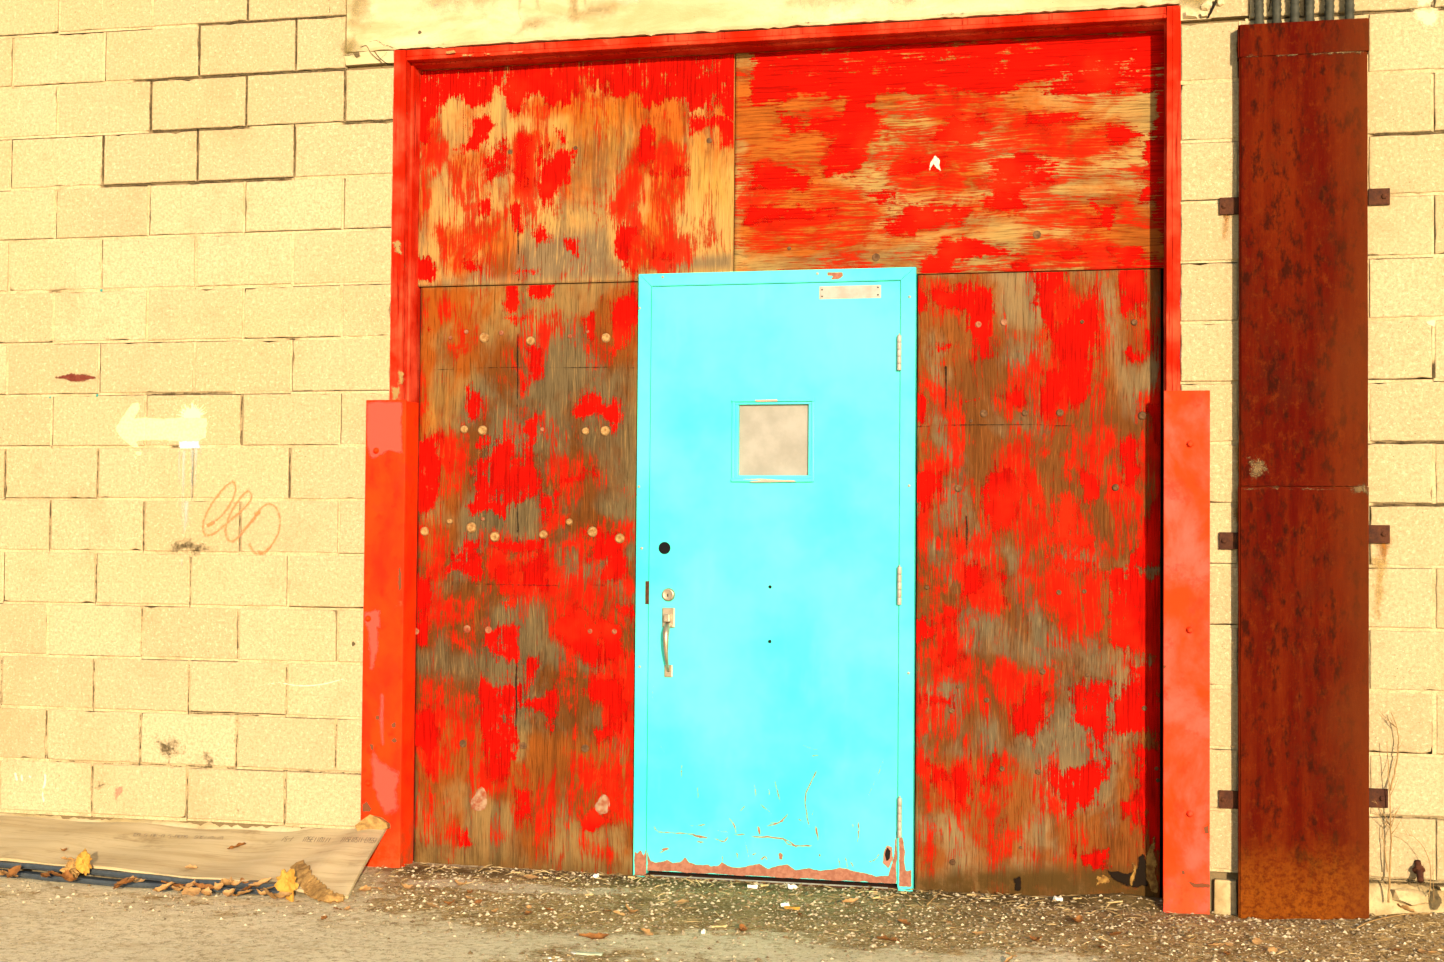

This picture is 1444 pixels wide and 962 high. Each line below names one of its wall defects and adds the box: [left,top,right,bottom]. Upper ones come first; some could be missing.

peeling [420,31,1164,425]
peeling [393,241,437,283]
peeling [1117,397,1160,488]
peeling [917,465,948,518]
peeling [398,379,635,833]
peeling [916,560,1011,675]
peeling [980,461,1166,856]
peeling [916,693,956,708]
peeling [925,751,1002,808]
peeling [457,825,476,850]
peeling [1073,845,1112,872]